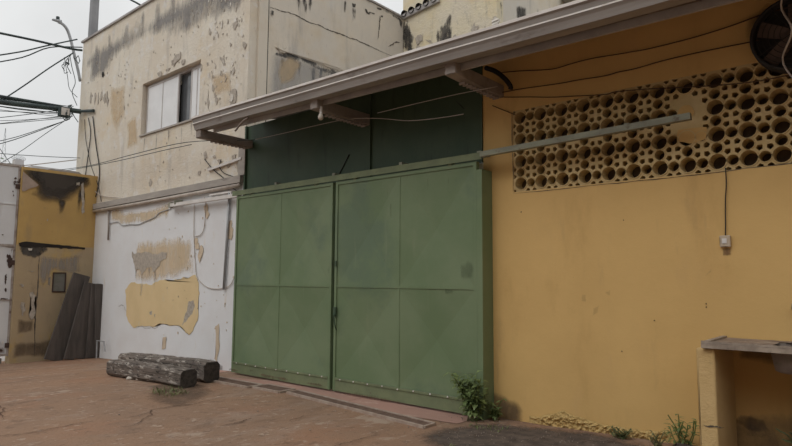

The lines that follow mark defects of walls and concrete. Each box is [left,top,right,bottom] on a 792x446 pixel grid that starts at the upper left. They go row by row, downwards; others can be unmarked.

peeling [208,0,247,56]
crack [271,7,400,55]
damp [428,15,451,42]
peeling [200,53,243,107]
damp [276,53,336,80]
damp [26,170,87,209]
peeling [125,252,205,335]
peeling [214,322,228,361]